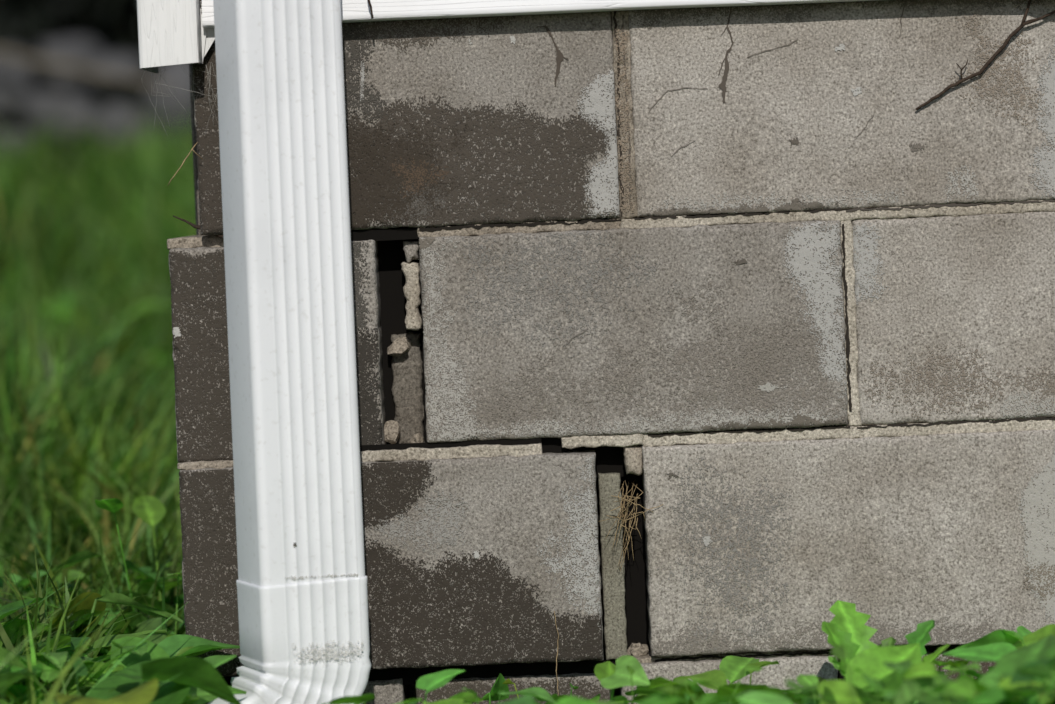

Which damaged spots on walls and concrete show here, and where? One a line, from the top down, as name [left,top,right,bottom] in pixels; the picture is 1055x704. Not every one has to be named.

leakage [342,0,1055,442]
crack [351,8,1055,685]
crack [222,676,239,686]
leakage [351,241,603,670]
leakage [416,675,610,704]
leakage [651,450,833,656]
leakage [922,611,1005,681]
leakage [1017,448,1055,624]